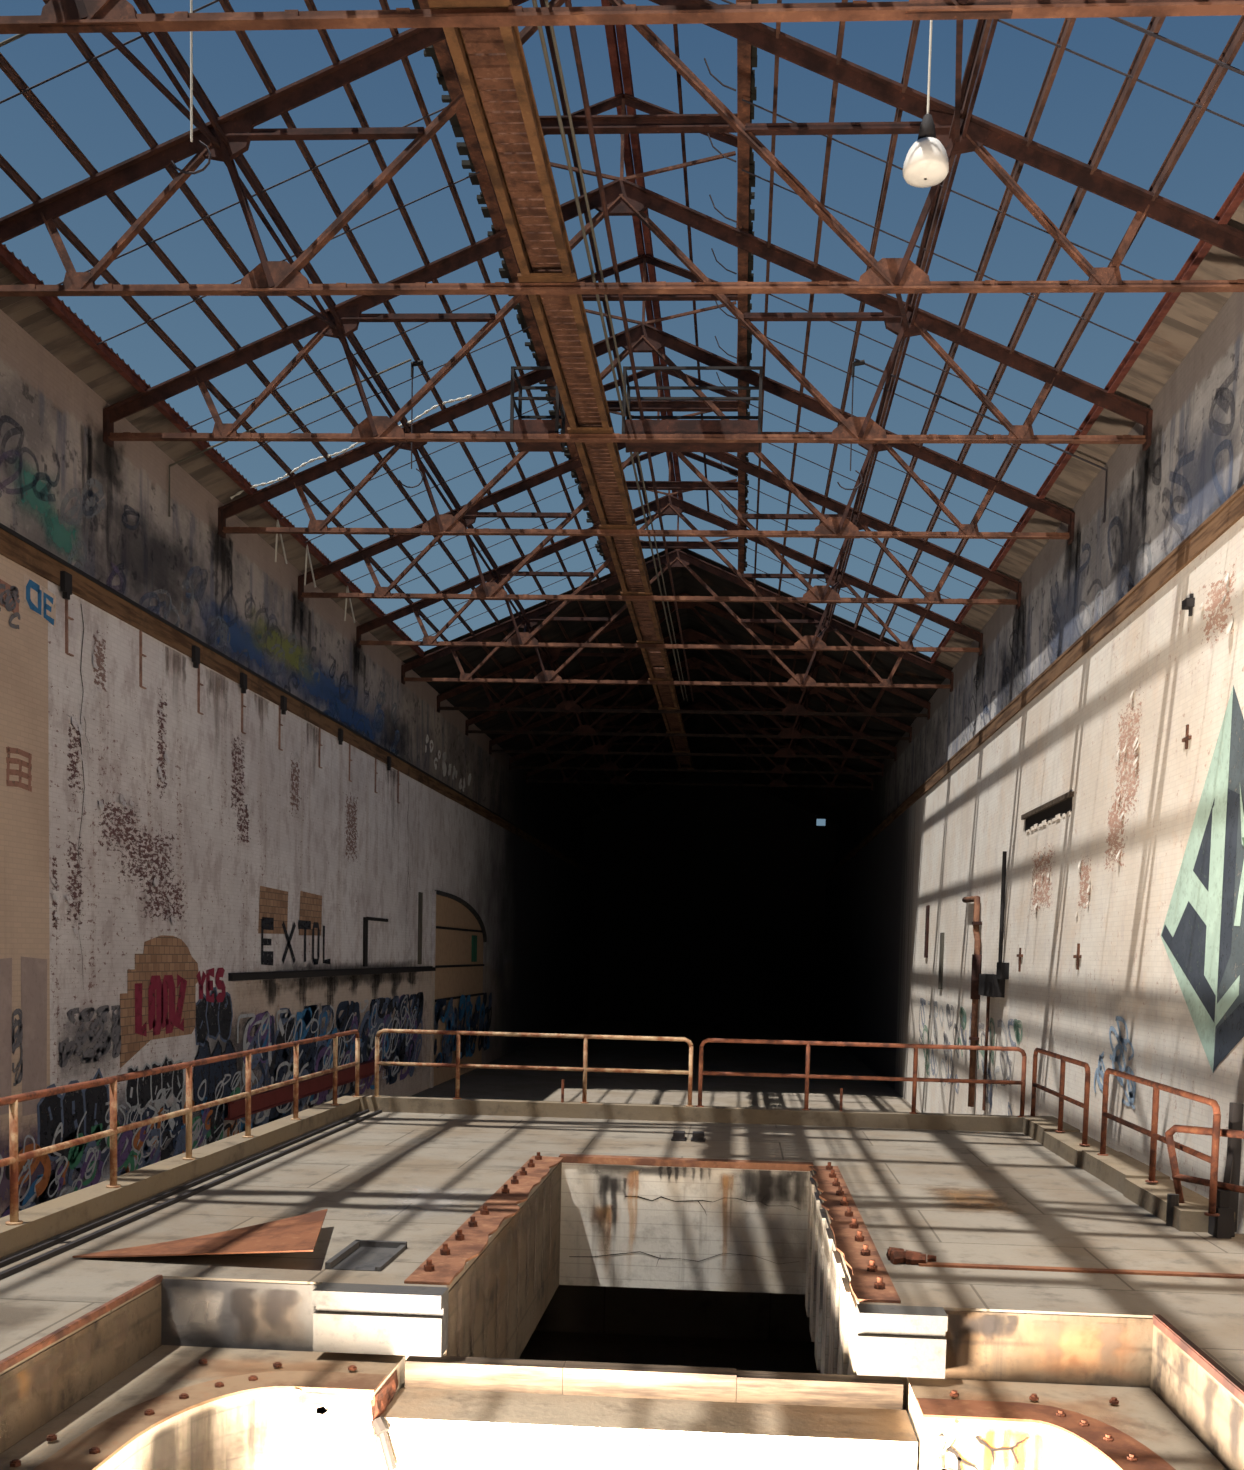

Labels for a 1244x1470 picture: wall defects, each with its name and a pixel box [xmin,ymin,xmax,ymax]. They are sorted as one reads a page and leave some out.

peeling [51,712,187,936]
peeling [1075,690,1144,917]
leakage [660,1167,702,1180]
leakage [600,1176,626,1223]
crack [625,1196,800,1213]
corrosion [982,1430,1029,1470]